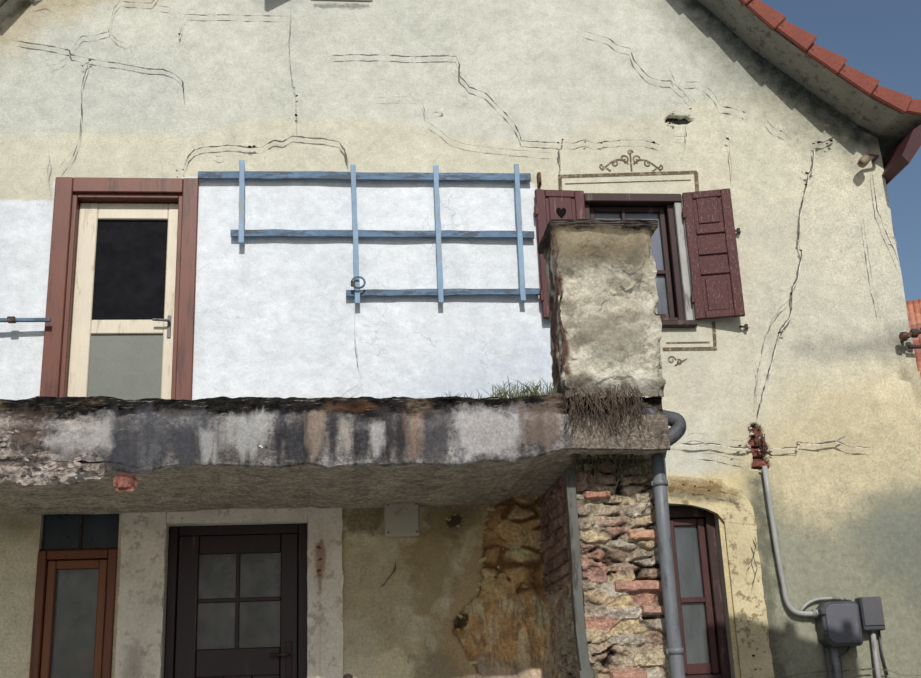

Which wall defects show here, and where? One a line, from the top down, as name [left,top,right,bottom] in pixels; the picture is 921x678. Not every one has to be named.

crack [13,0,348,189]
crack [333,54,620,171]
spalling [665,110,694,126]
crack [580,29,790,145]
crack [554,238,565,365]
crack [676,113,873,461]
damp [8,408,314,470]
damp [329,407,406,456]
spalling [450,495,552,678]